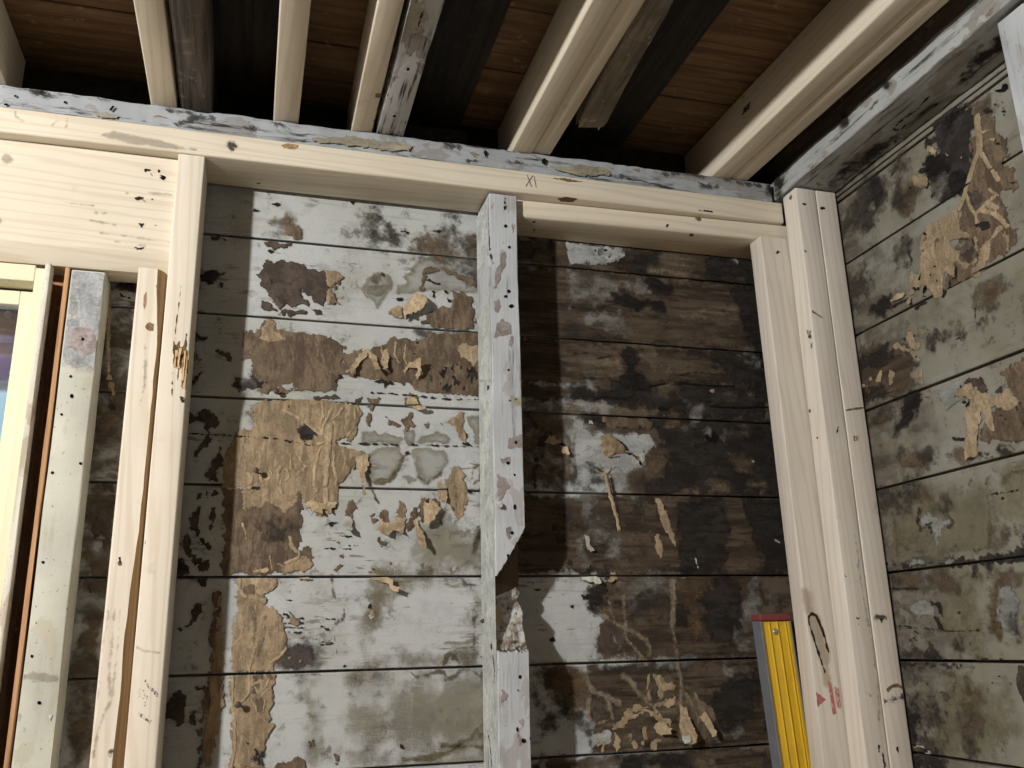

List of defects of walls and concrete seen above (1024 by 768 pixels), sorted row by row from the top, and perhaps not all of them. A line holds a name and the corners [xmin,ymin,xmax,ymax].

leakage [830,94,1005,233]
peeling [241,202,479,446]
leakage [354,206,477,308]
leakage [517,237,534,258]
leakage [846,264,892,318]
leakage [926,329,966,352]
peeling [954,357,1024,460]
leakage [522,410,578,492]
peeling [578,412,671,489]
peeling [369,466,473,548]
peeling [274,739,314,768]
peeling [654,704,717,745]